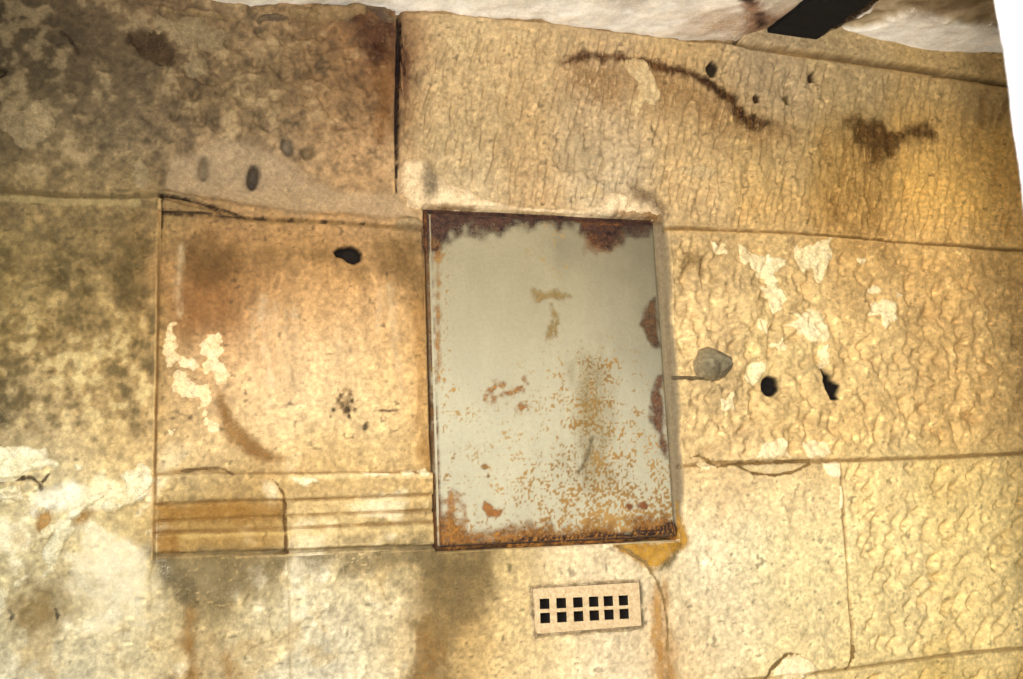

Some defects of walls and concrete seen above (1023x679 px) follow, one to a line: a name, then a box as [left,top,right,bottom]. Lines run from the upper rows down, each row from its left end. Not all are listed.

leakage [565,51,631,63]
leakage [643,58,771,130]
leakage [846,118,936,160]
rust [421,205,661,379]
rust [484,378,525,402]
rust [649,375,667,454]
peeling [0,445,155,539]
rust [431,389,688,567]
leakage [156,552,285,653]
leakage [344,546,489,679]
rust [652,586,673,679]